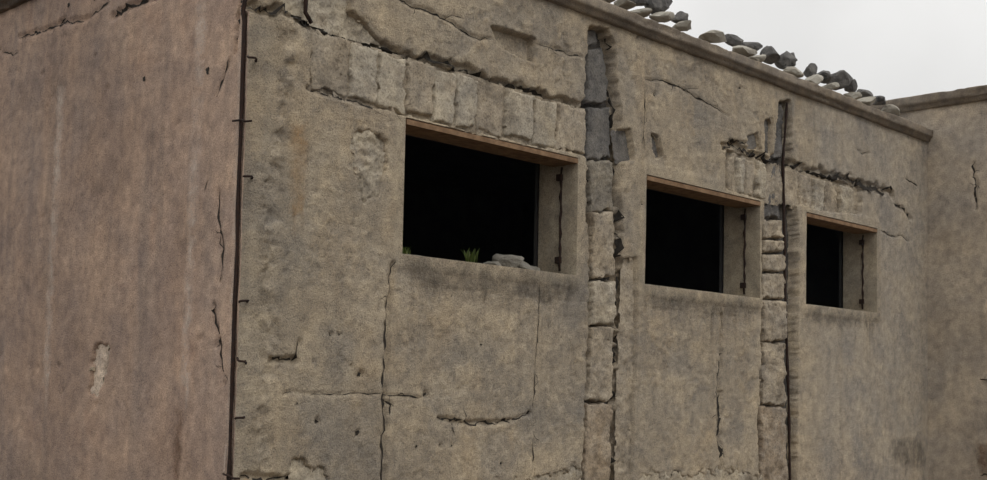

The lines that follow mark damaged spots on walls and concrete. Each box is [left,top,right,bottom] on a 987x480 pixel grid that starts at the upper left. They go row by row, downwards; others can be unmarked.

crack [4,0,148,56]
crack [641,79,722,144]
crack [204,180,224,280]
spalling [222,0,258,480]
spalling [281,0,858,480]
crack [722,138,917,240]
crack [971,162,979,203]
spalling [89,344,110,397]
crack [211,307,228,379]
crack [270,343,298,361]
crack [316,262,425,480]
crack [437,289,540,478]